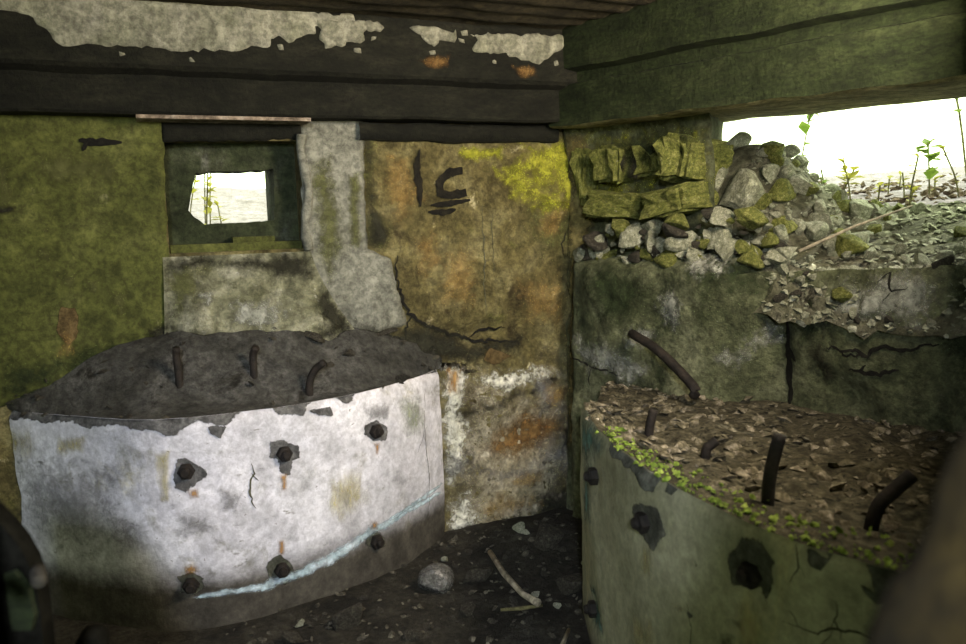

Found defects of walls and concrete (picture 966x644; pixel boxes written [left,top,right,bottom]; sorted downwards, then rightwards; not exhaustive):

peeling [0,0,384,62]
peeling [410,25,564,66]
crack [394,204,517,343]
spalling [836,275,935,326]
crack [826,343,939,377]
spalling [9,411,244,438]
spalling [268,393,357,416]
spalling [364,420,388,453]
crack [783,600,867,644]